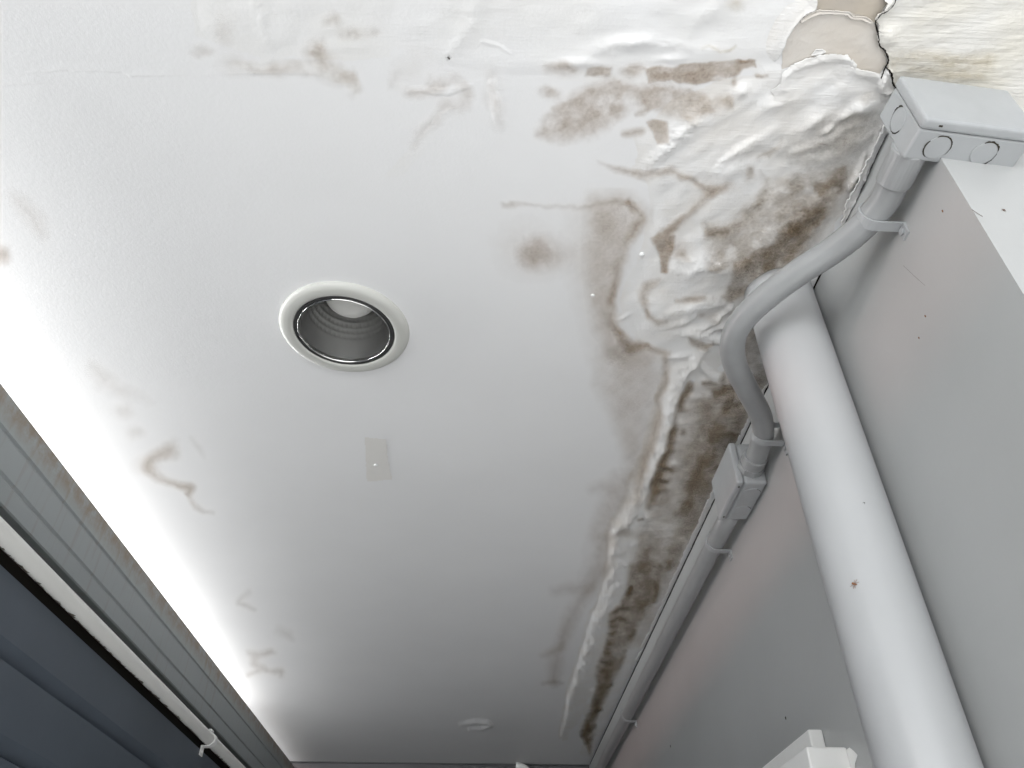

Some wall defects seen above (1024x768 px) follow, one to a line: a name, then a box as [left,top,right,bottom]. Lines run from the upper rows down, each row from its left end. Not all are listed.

crack [875,0,896,88]
flaking render [766,0,1024,112]
water stain [581,662,619,745]